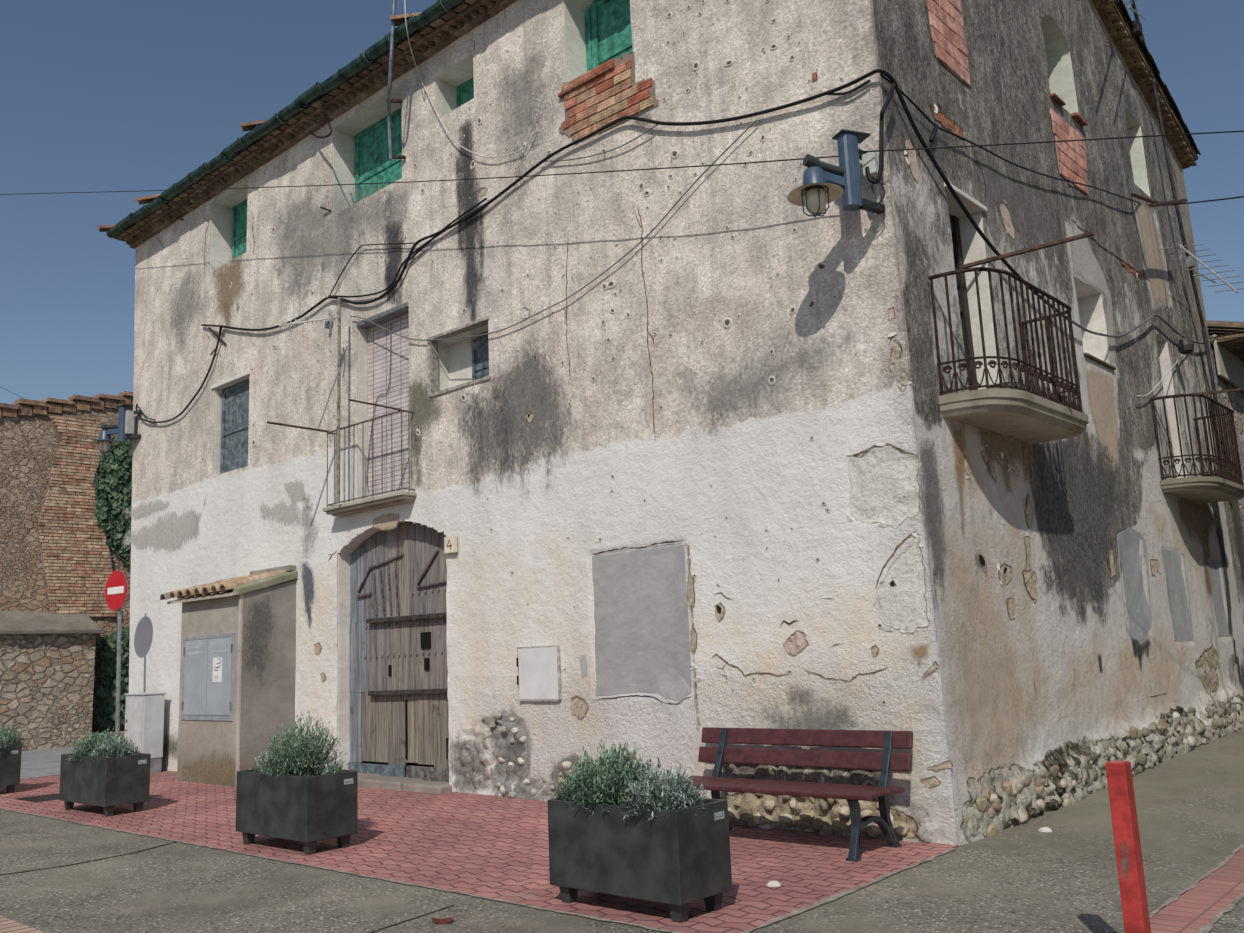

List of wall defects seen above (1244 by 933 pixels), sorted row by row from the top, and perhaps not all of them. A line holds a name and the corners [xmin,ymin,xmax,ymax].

damp [456,122,483,349]
damp [1135,203,1169,303]
damp [458,349,568,486]
spalling [847,443,930,633]
damp [980,429,1117,622]
crack [712,644,887,681]